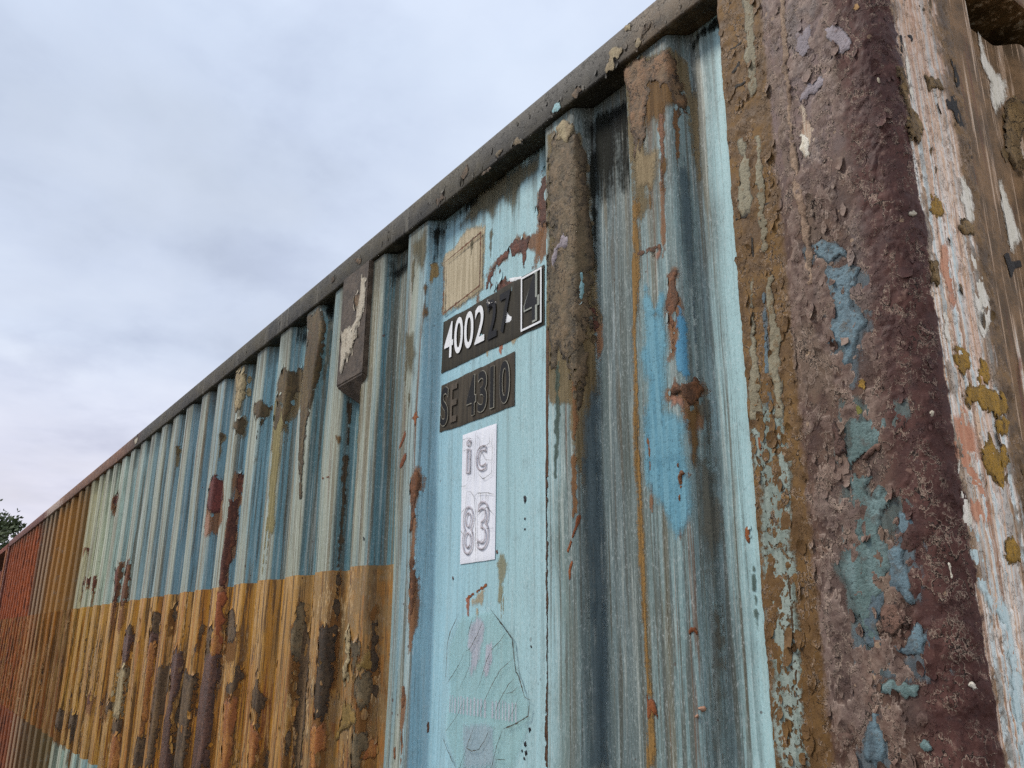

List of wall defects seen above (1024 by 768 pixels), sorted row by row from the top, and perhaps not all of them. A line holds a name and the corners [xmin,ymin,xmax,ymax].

peeling [978,33,1024,176]
corrosion [219,362,304,571]
peeling [339,254,366,374]
corrosion [476,163,548,302]
corrosion [664,376,708,501]
peeling [734,1,947,768]
peeling [940,237,996,350]
peeling [999,182,1021,251]
corrosion [204,466,244,655]
corrosion [408,468,426,651]
peeling [949,407,1024,766]
corrosion [108,731,122,768]